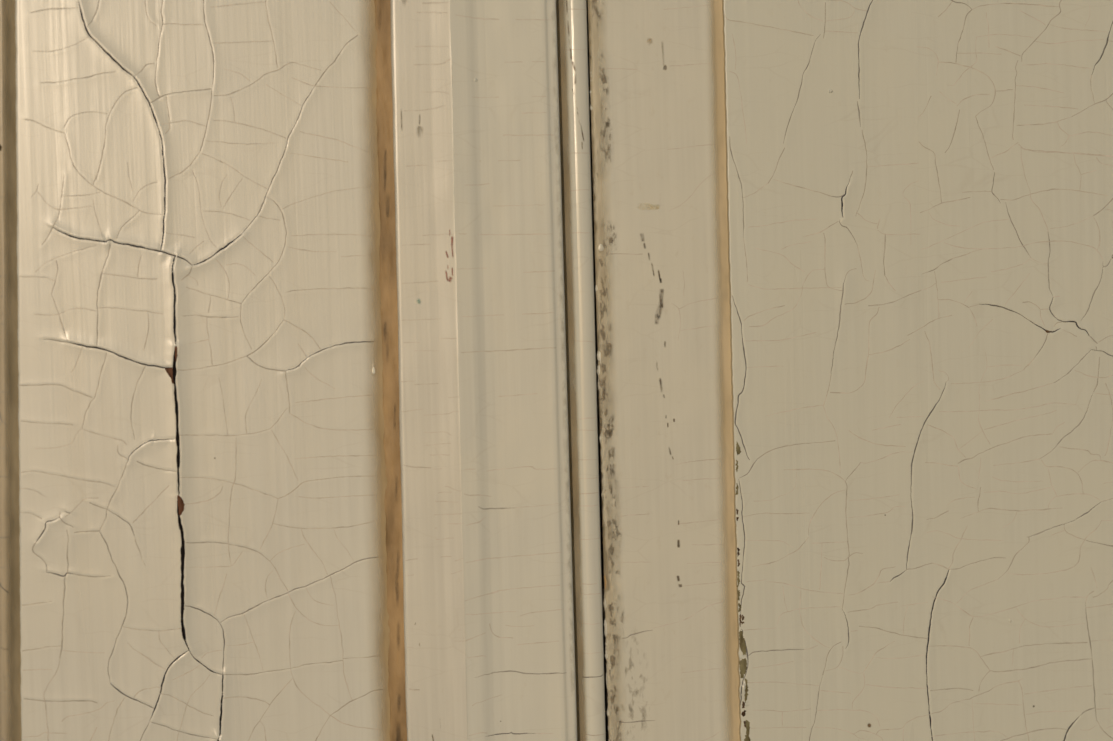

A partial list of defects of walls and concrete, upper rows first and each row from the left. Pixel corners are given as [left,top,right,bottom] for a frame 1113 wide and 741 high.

crack [0,0,506,741]
crack [475,623,652,678]
peeling [737,548,750,741]
crack [724,0,1113,741]